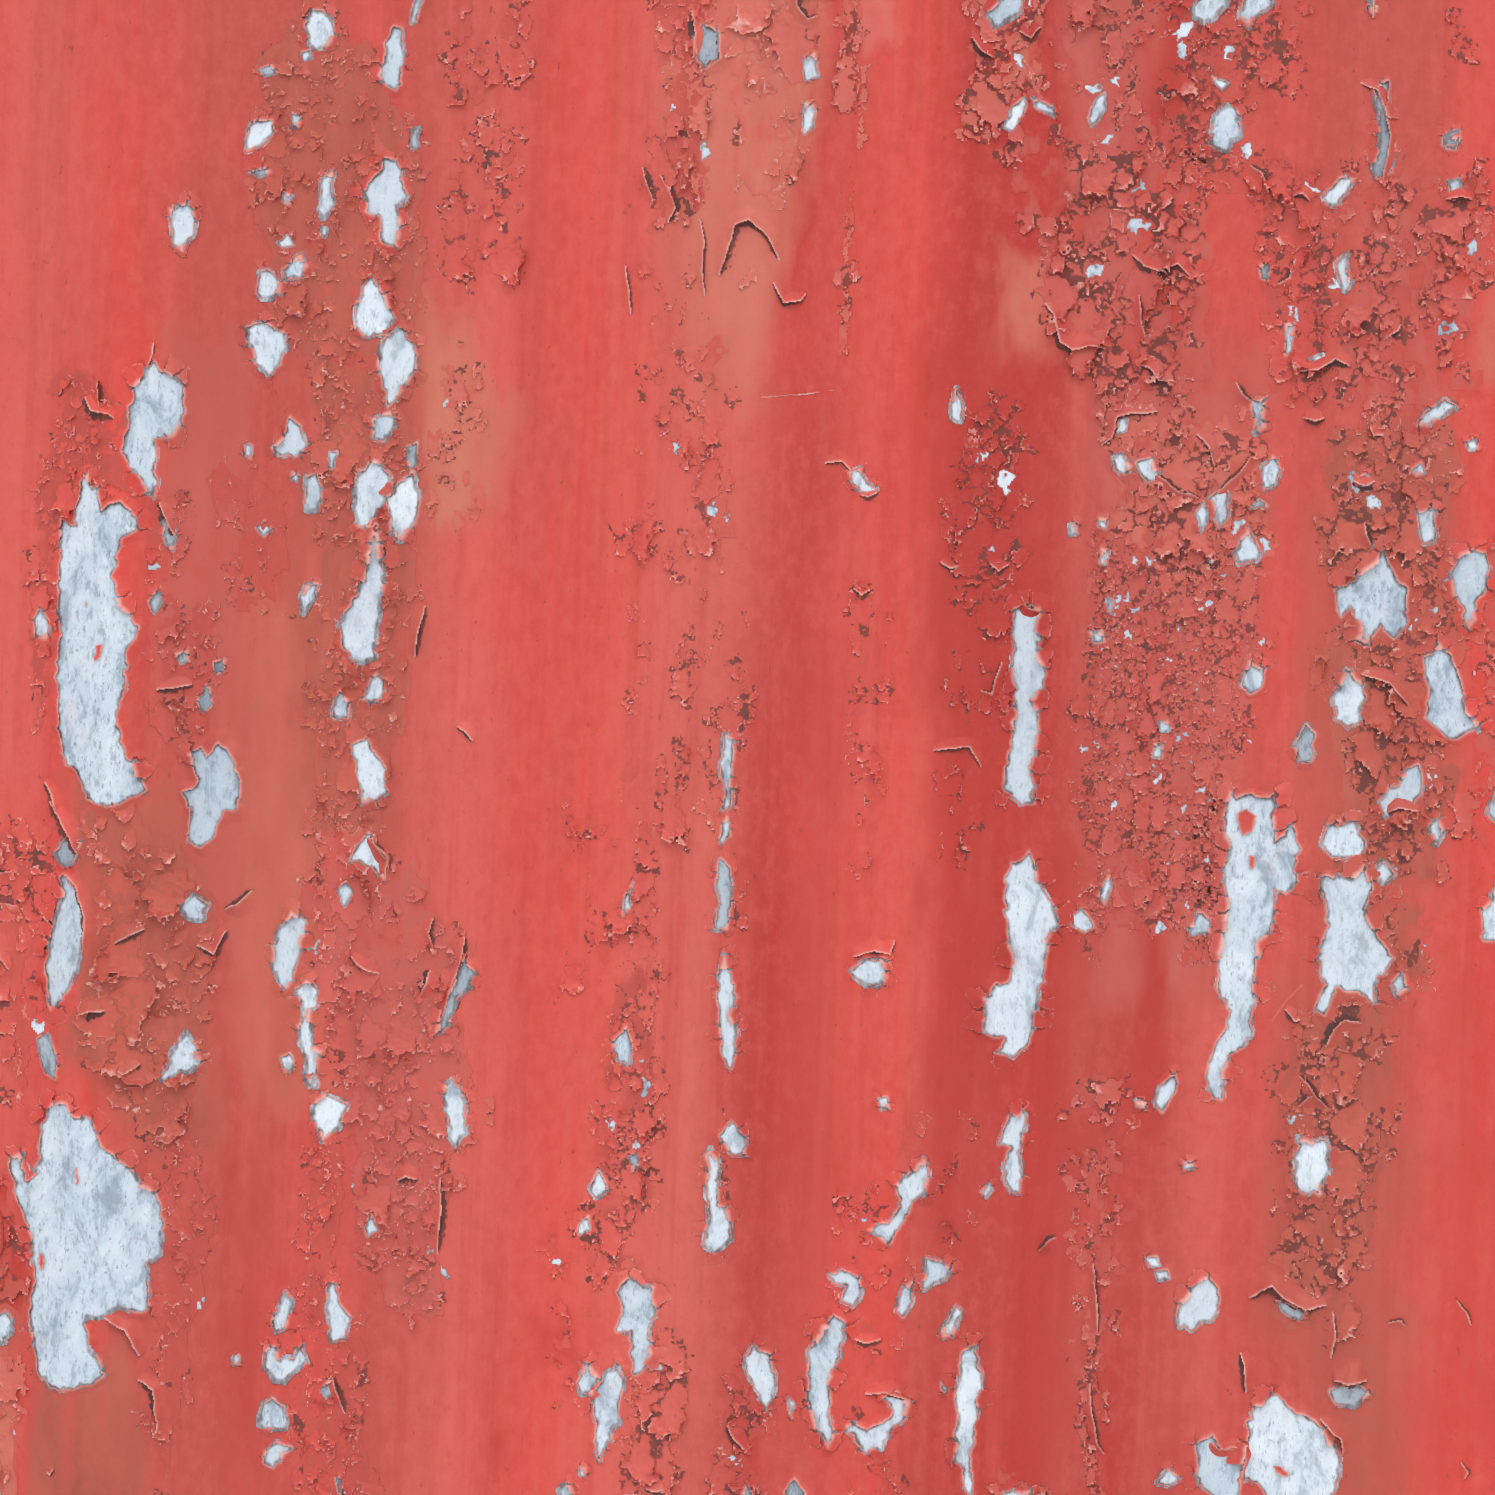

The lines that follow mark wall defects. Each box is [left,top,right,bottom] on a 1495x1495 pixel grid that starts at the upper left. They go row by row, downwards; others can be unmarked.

peeling [161,191,203,257]
peeling [608,0,870,604]
peeling [841,460,883,502]
peeling [0,349,257,1495]
peeling [229,0,536,1495]
peeling [535,621,758,1495]
peeling [841,580,896,825]
peeling [841,934,897,997]
peeling [704,1099,1053,1495]
peeling [873,1090,894,1114]
peeling [924,0,1495,1495]